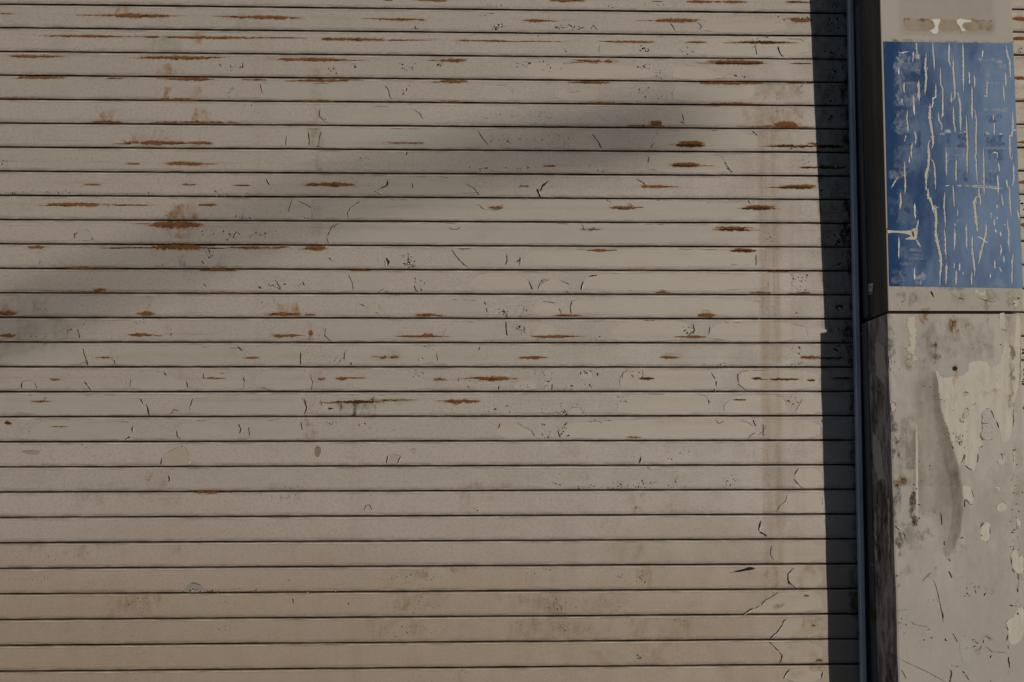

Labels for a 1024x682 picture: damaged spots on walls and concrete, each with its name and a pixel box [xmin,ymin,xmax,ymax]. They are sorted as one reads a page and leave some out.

peeling [923,297,1024,533]
crack [899,499,1011,668]
peeling [1006,605,1024,645]